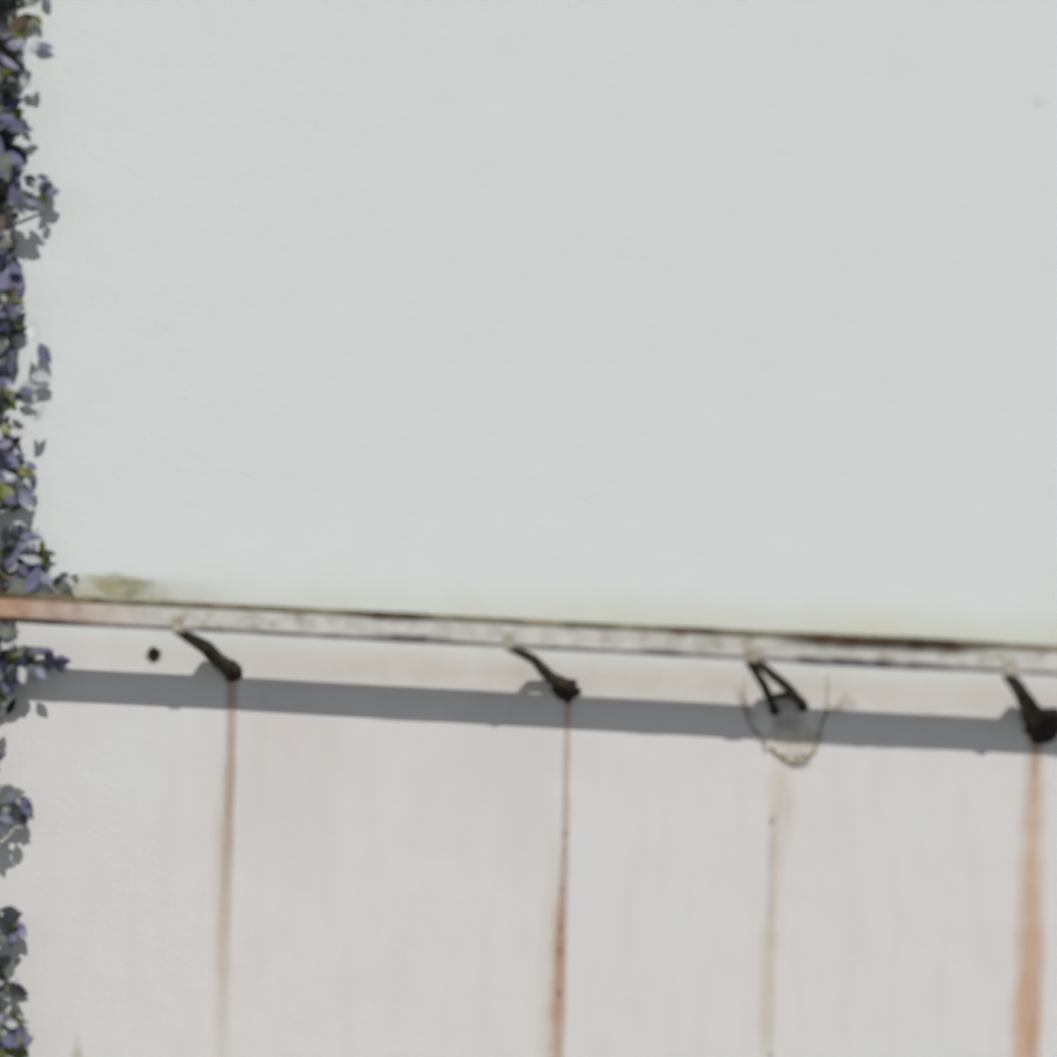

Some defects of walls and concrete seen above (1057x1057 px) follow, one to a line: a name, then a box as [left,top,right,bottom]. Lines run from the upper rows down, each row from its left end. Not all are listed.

rust [0,599,66,625]